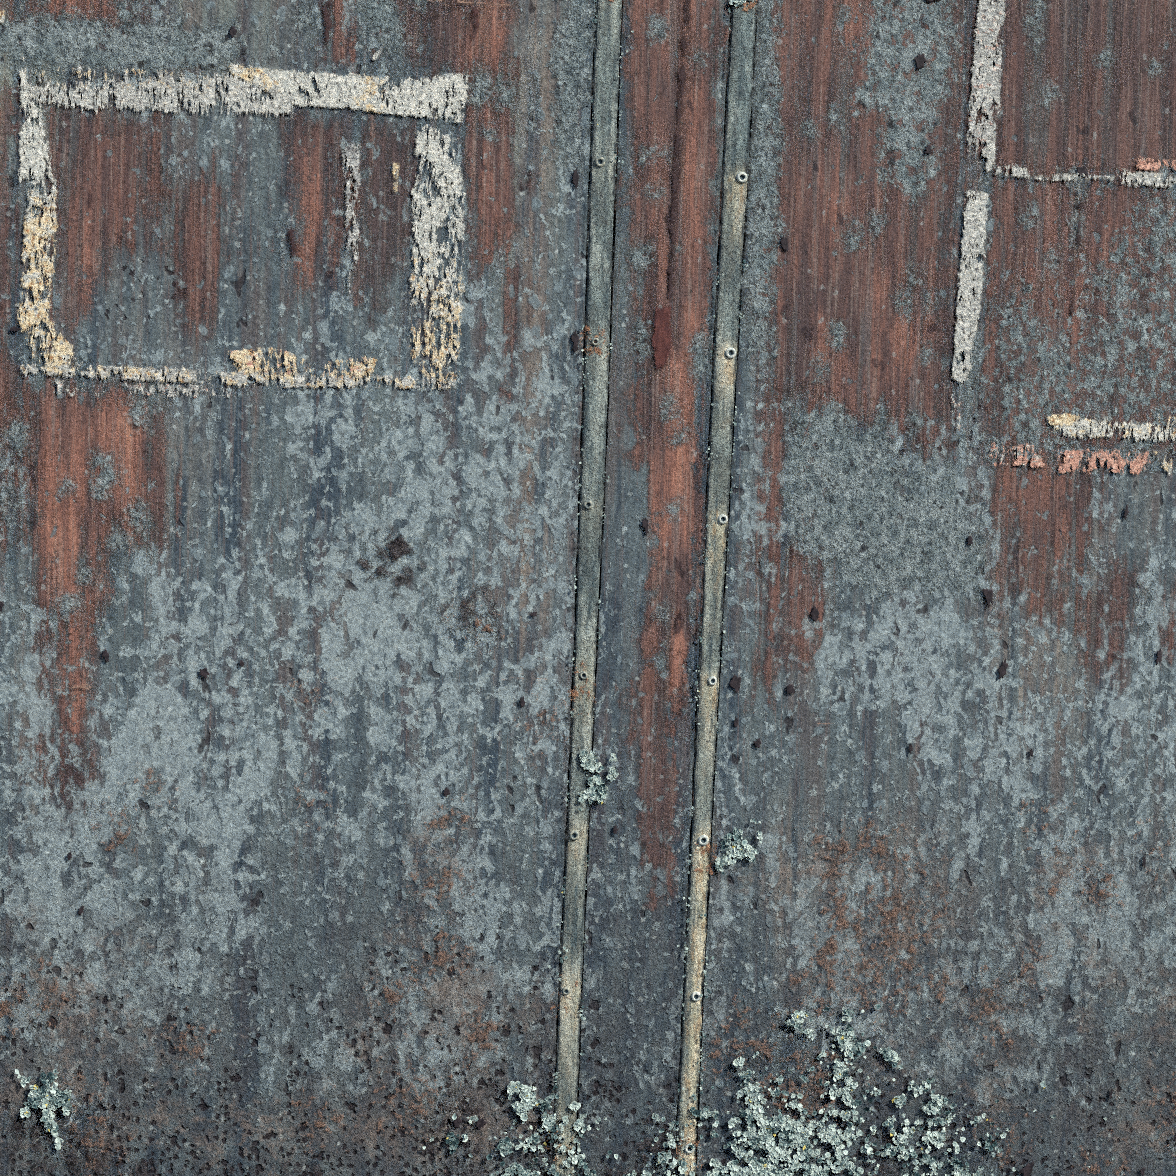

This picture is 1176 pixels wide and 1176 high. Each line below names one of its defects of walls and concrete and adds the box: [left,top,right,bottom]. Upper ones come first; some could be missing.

peeling [41,94,241,351]
peeling [281,110,420,329]
peeling [379,0,531,403]
peeling [0,83,182,814]
peeling [615,0,731,911]
peeling [729,0,1176,728]
corrosion [512,661,596,769]
corrosion [0,1072,168,1176]
corrosion [280,1083,359,1154]
corrosion [354,923,510,1162]
corrosion [598,1097,704,1176]
corrosion [702,806,1052,1176]